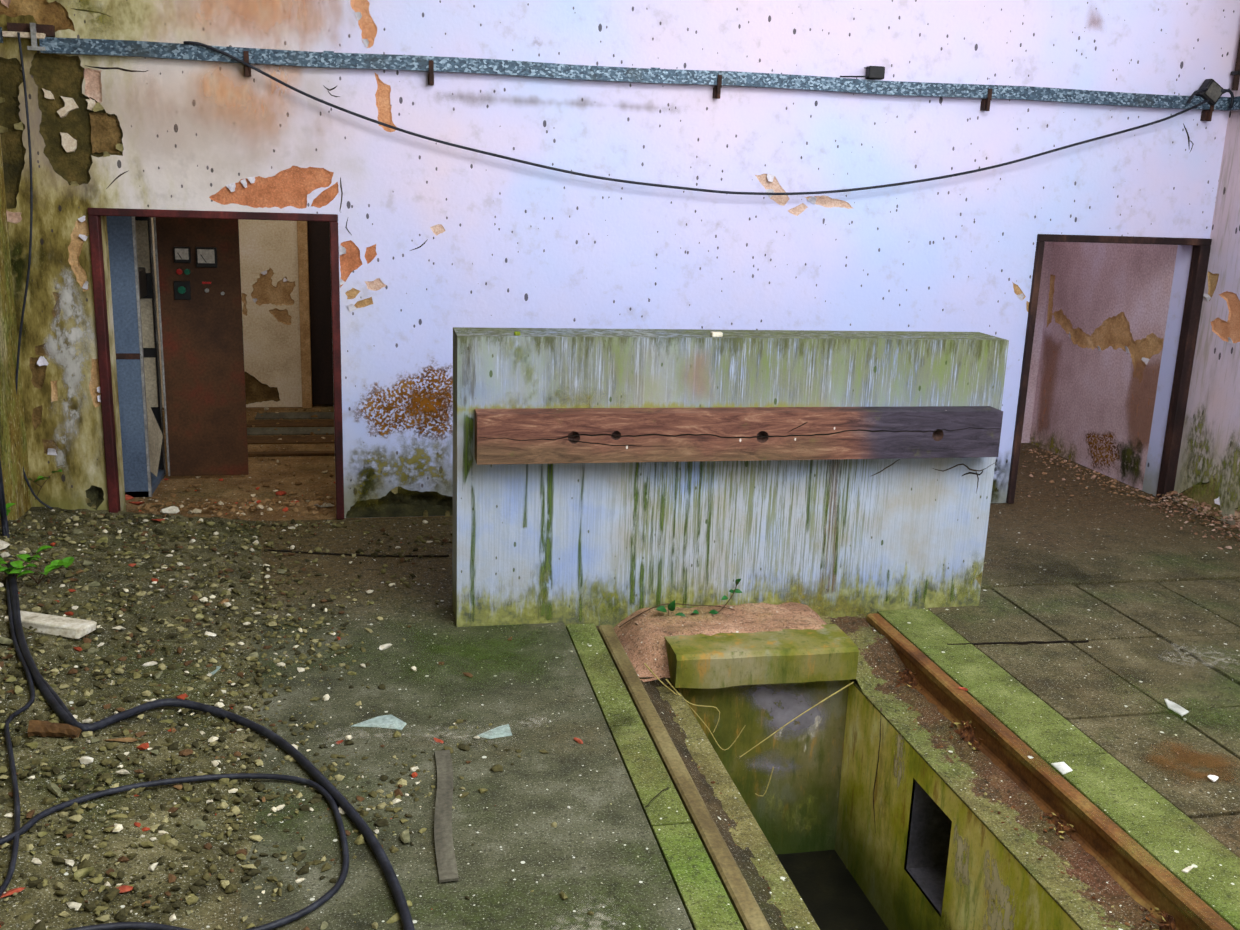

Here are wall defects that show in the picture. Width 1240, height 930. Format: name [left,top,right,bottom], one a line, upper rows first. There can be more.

spalling [0,0,75,37]
peeling [350,0,377,48]
spalling [0,52,124,223]
peeling [375,73,396,132]
peeling [209,166,339,209]
peeling [339,240,387,312]
peeling [1046,274,1163,374]
damp [463,400,473,482]
damp [523,464,554,620]
damp [639,461,713,609]
damp [806,460,849,592]
damp [983,851,1015,930]